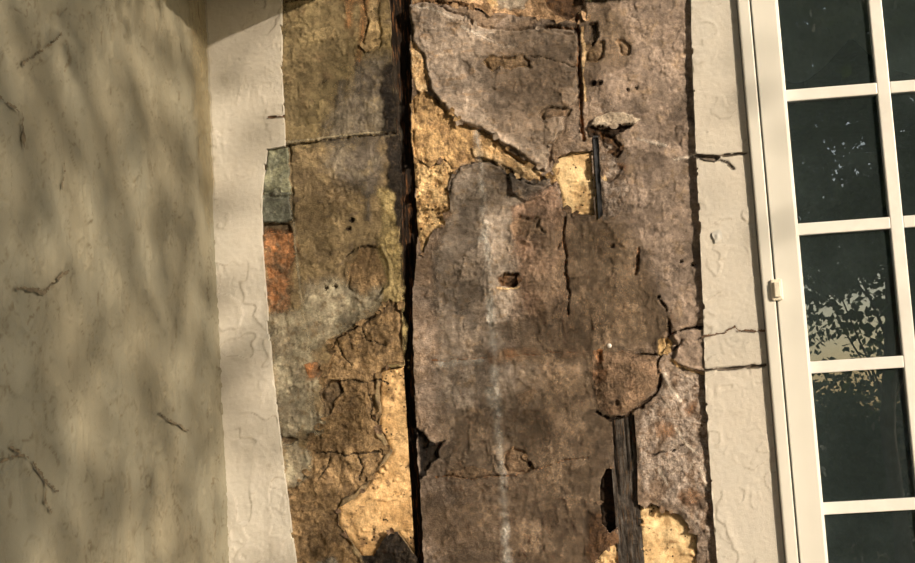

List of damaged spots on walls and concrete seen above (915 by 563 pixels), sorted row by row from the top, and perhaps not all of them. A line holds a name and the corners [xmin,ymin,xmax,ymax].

peeling [360,0,381,53]
peeling [409,0,601,201]
peeling [587,111,641,158]
crack [694,152,747,170]
spalling [263,222,292,234]
spalling [510,215,546,240]
spalling [498,272,523,288]
crack [595,299,766,422]
peeling [660,329,705,370]
spalling [281,299,405,563]
spalling [416,428,444,479]
spalling [596,465,616,533]